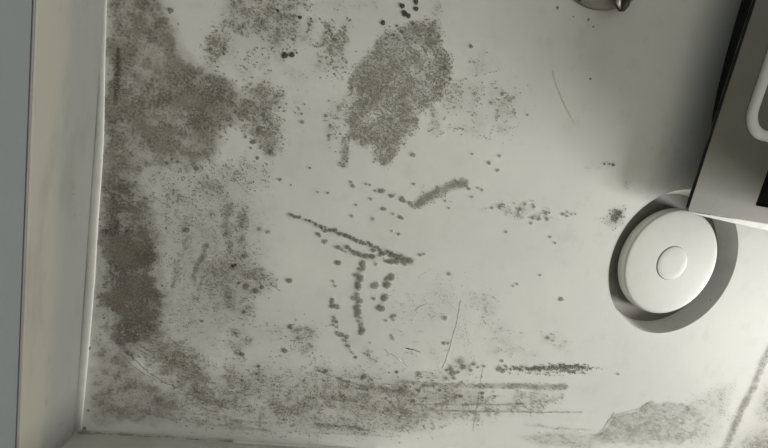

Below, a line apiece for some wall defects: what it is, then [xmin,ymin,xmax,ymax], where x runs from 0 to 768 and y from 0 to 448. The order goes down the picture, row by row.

mould [83,0,602,444]
water stain [527,351,768,448]